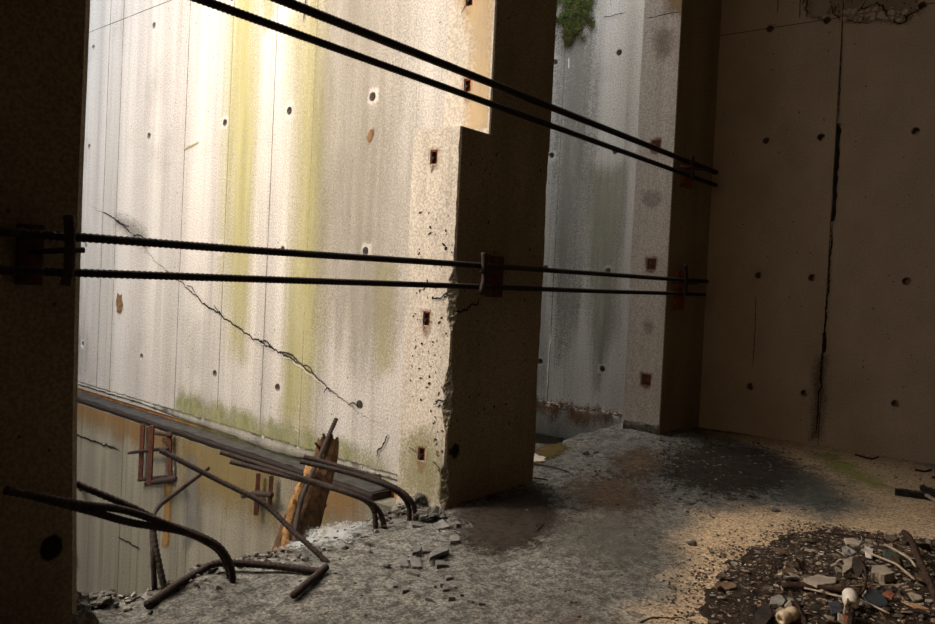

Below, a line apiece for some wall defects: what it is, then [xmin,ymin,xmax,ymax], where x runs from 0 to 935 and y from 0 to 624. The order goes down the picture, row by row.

peeling [802,0,924,25]
crack [815,2,844,433]
corrosion [77,403,277,520]
crack [95,208,389,456]
spalling [410,266,480,510]
corrosion [536,397,614,431]
peeling [449,520,461,545]